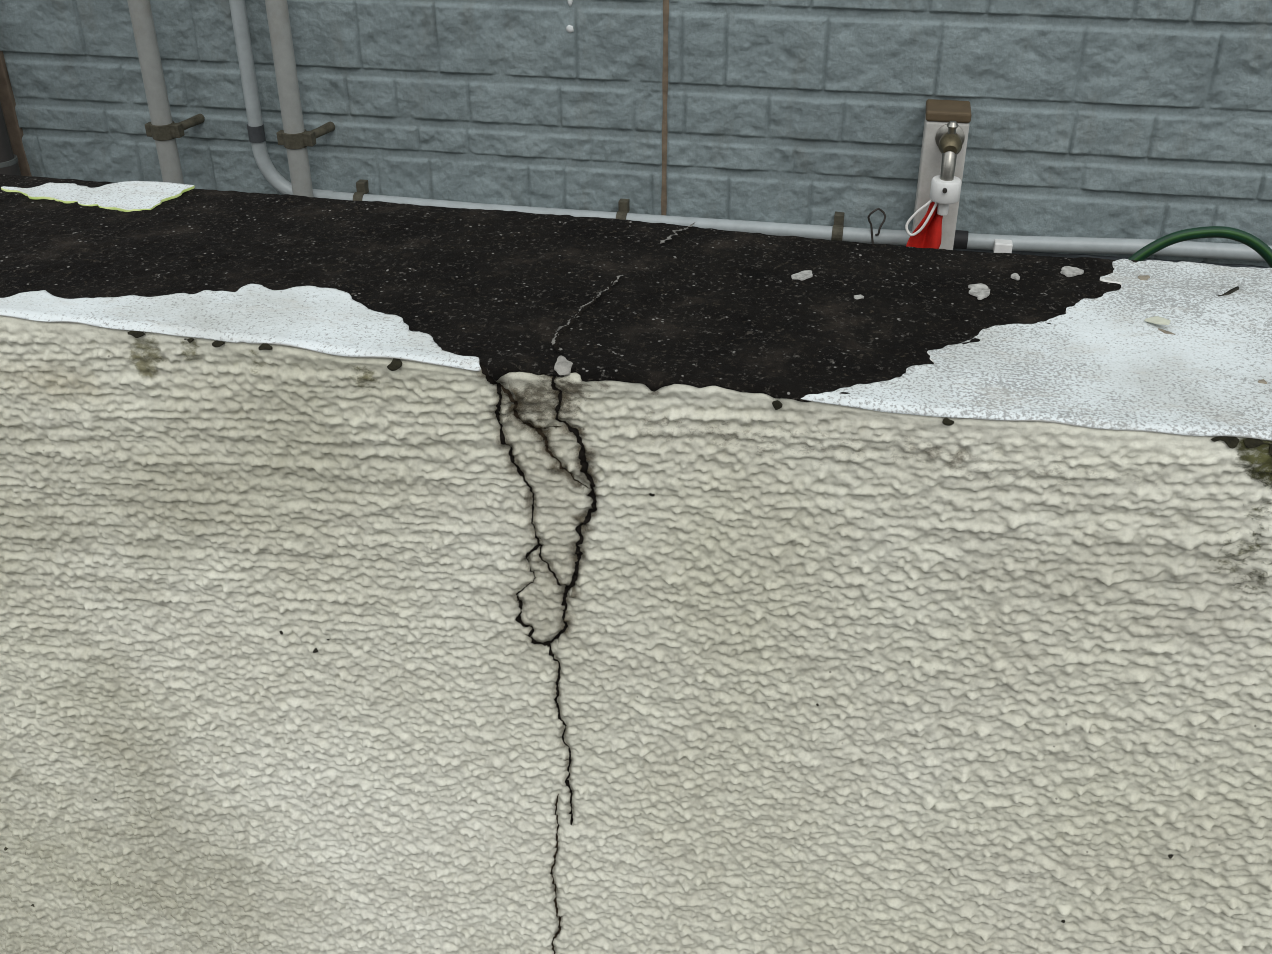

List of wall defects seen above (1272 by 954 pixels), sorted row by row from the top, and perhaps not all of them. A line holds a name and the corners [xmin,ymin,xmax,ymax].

peeling [0,174,1121,410]
crack [660,222,695,243]
crack [479,275,624,954]
water stain [1218,503,1272,590]